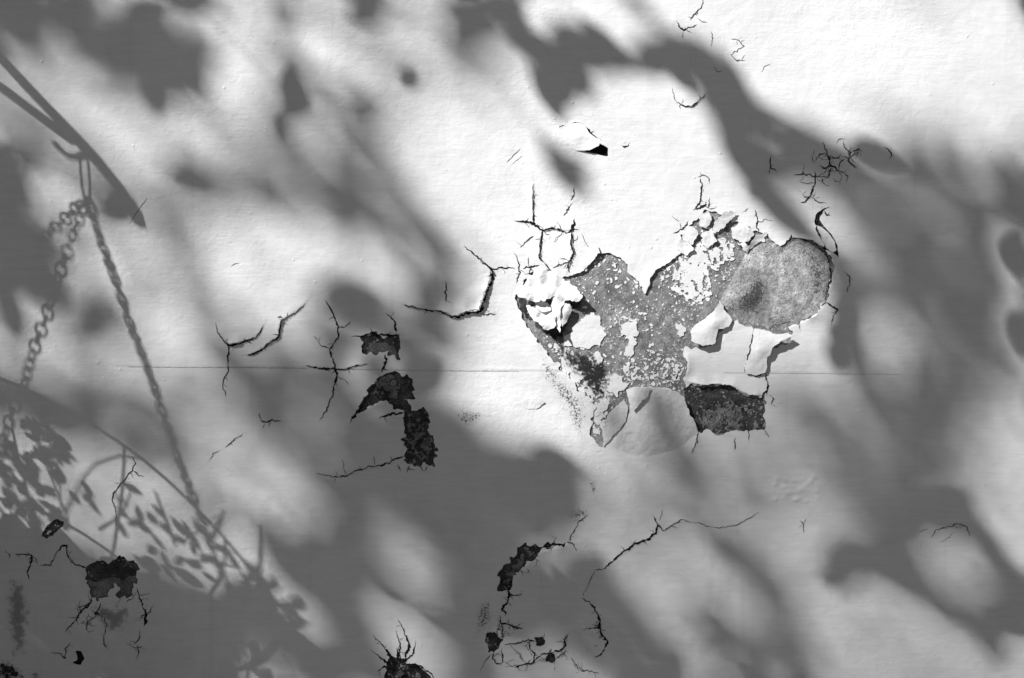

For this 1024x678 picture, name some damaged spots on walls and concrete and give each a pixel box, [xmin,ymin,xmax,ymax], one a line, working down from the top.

crack [769,138,892,203]
crack [405,187,589,319]
crack [129,300,371,419]
spalling [317,312,438,482]
peeling [515,207,839,457]
crack [7,551,37,578]
spalling [40,519,154,657]
spalling [371,620,434,678]
spalling [497,517,585,630]
crack [484,509,759,676]